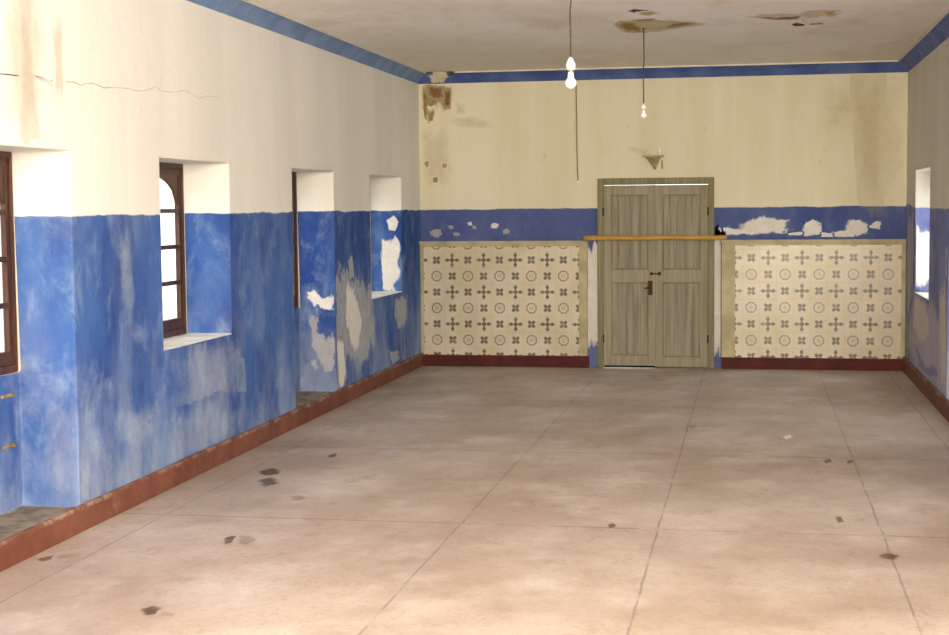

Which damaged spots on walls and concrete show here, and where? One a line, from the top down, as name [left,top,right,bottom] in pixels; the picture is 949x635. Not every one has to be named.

damp [604,17,716,35]
damp [0,0,67,146]
crack [0,73,216,98]
peeling [427,221,477,238]
peeling [490,222,512,235]
peeling [714,214,882,356]
peeling [304,214,408,389]